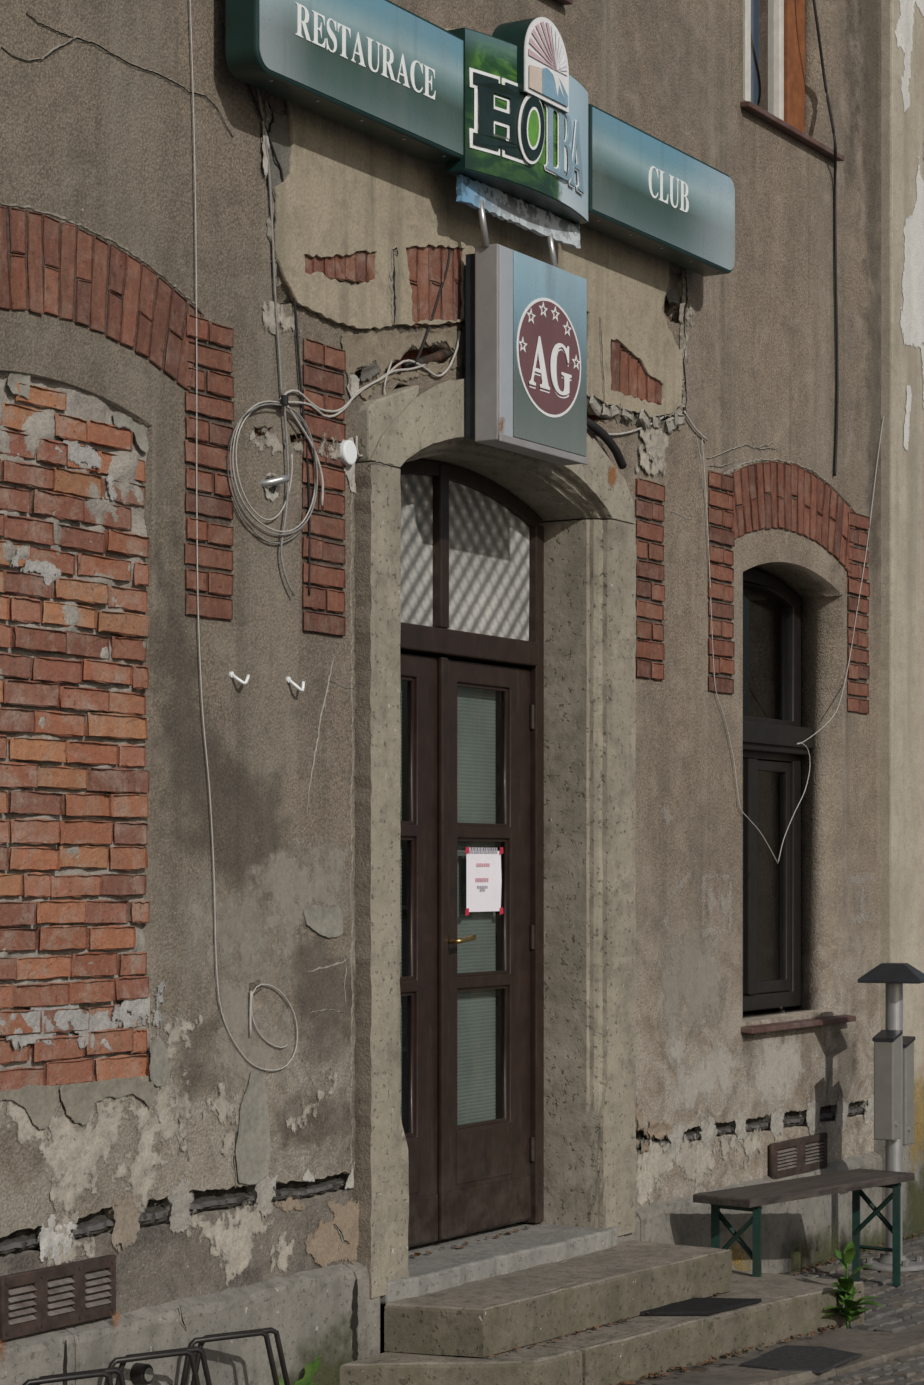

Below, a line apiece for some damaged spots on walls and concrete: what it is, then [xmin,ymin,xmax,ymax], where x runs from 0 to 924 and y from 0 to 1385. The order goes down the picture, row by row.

crack [1,13,233,138]
peeling [895,0,924,112]
flaking render [261,100,291,284]
flaking render [263,300,301,336]
flaking render [304,250,375,285]
flaking render [341,245,466,400]
flaking render [587,267,695,477]
peeling [900,155,924,451]
flaking render [0,981,240,1267]
flaking render [286,1066,337,1132]
flaking render [635,1097,761,1209]
flaking render [187,1162,360,1288]